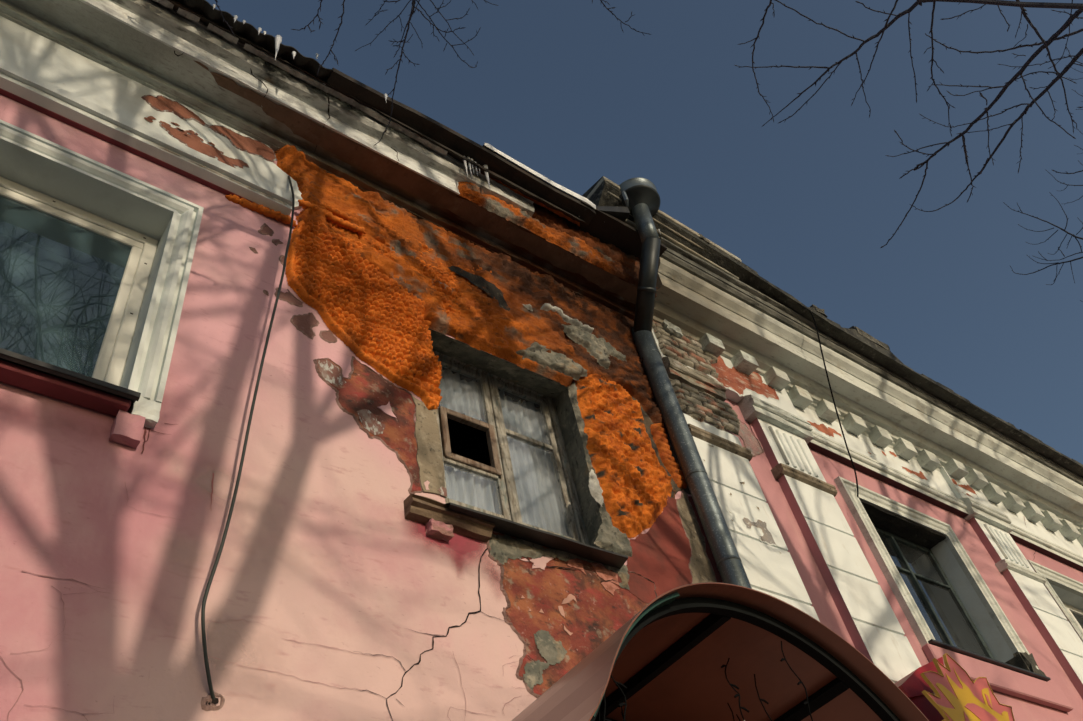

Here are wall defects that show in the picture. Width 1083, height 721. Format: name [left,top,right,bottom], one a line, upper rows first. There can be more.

flaking render [141,95,278,168]
flaking render [195,61,637,304]
flaking render [263,287,337,343]
flaking render [313,356,447,498]
spalling [448,266,510,311]
flaking render [523,303,626,369]
flaking render [652,321,780,457]
flaking render [487,342,723,698]
peeling [727,505,778,546]
crack [0,586,115,721]
crack [206,548,540,721]